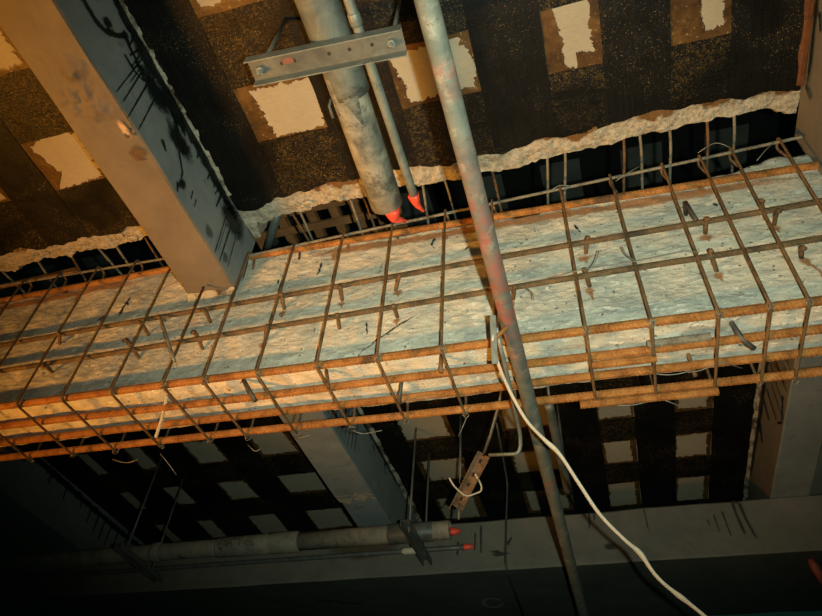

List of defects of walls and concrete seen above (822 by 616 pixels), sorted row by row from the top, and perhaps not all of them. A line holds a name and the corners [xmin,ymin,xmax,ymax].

peeling [119,0,232,197]
leakage [82,0,243,266]
spalling [477,89,801,172]
spalling [238,178,367,238]
spalling [393,162,461,187]
rust [494,180,766,228]
spalling [0,226,147,272]
rust [322,226,476,260]
rust [0,282,129,312]
spalling [186,287,236,305]
peeling [279,411,376,505]
peeling [742,384,761,501]